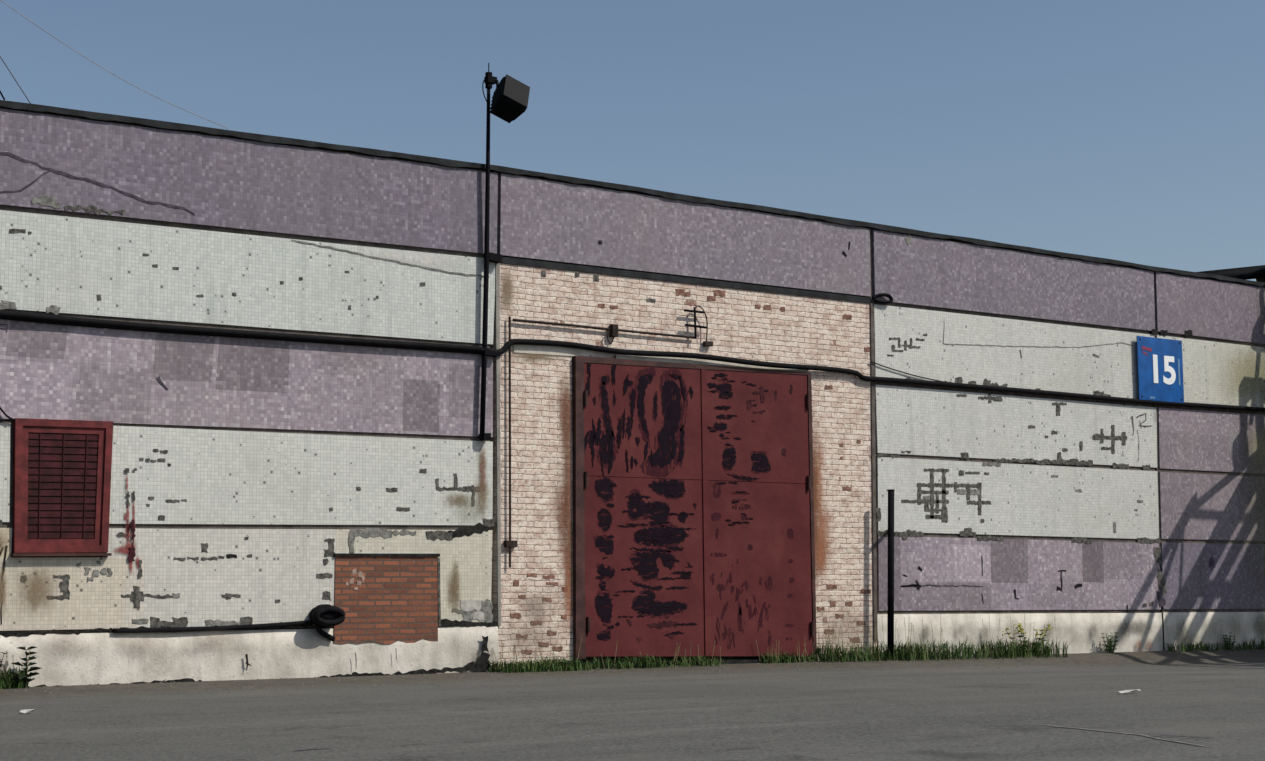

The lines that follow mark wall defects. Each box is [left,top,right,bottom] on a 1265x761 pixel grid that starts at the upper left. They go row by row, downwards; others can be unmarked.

crack [0,152,195,215]
peeling [887,333,927,356]
spalling [1028,402,1067,438]
spalling [125,449,171,473]
spalling [420,469,480,507]
corrosion [559,389,572,613]
spalling [876,425,1150,541]
spalling [0,491,188,637]
spalling [174,536,252,561]
spalling [316,518,497,600]
spalling [1137,537,1167,607]
peeling [817,584,871,642]